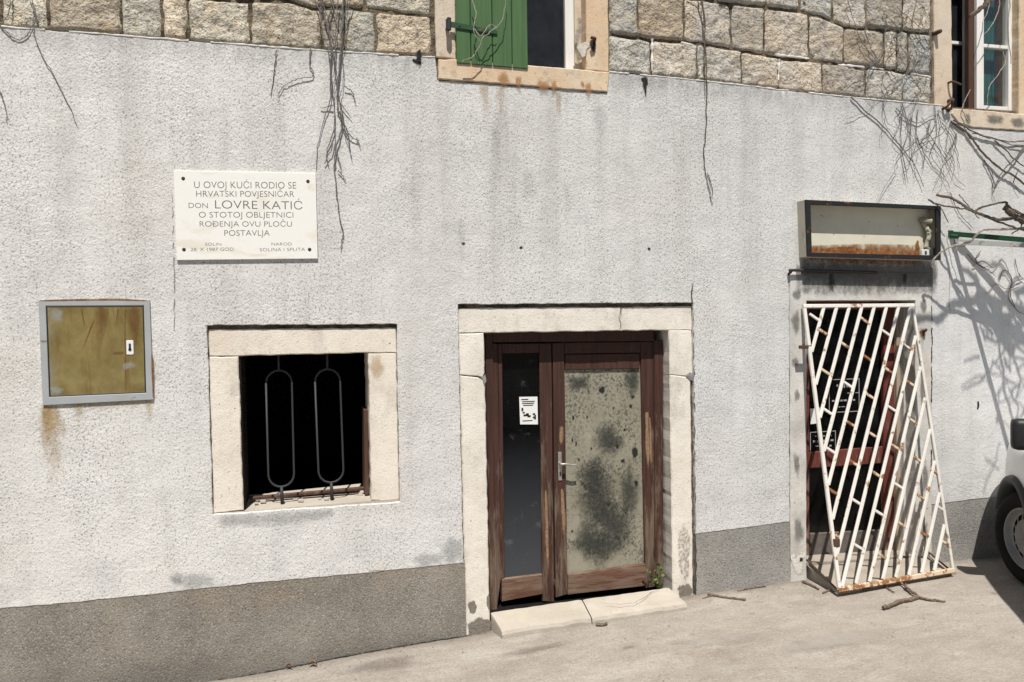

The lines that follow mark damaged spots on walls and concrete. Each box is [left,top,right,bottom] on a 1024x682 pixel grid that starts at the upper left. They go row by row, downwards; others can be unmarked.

corrosion [43,406,59,440]